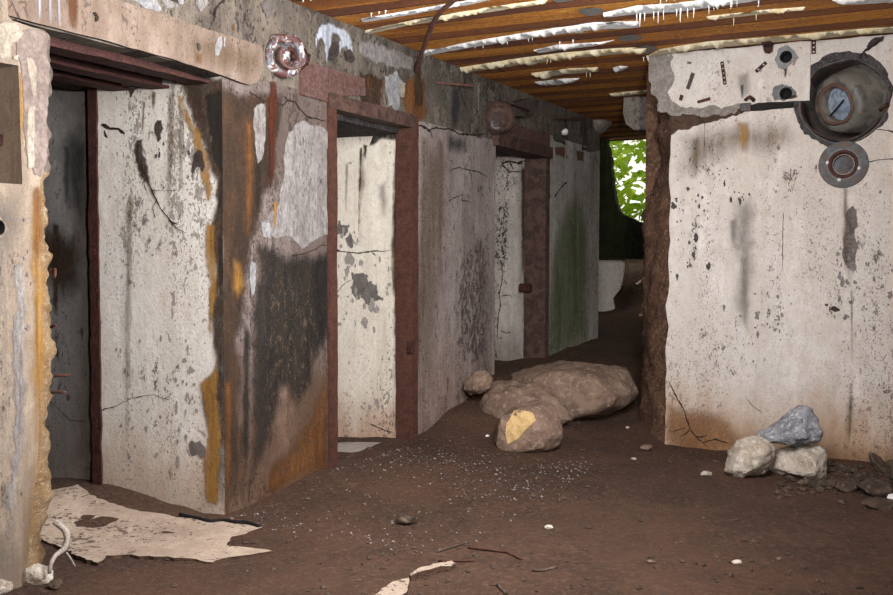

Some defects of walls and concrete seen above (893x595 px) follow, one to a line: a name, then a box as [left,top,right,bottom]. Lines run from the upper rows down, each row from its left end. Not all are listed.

spalling [328,42,355,63]
corrosion [135,139,154,193]
peeling [253,103,266,163]
spalling [552,0,750,280]
corrosion [33,189,43,389]
water stain [44,224,76,301]
corrosion [169,77,281,504]
peeling [250,247,265,296]
peeling [261,121,391,333]
crack [292,244,392,256]
water stain [243,246,328,461]
crack [668,381,727,446]